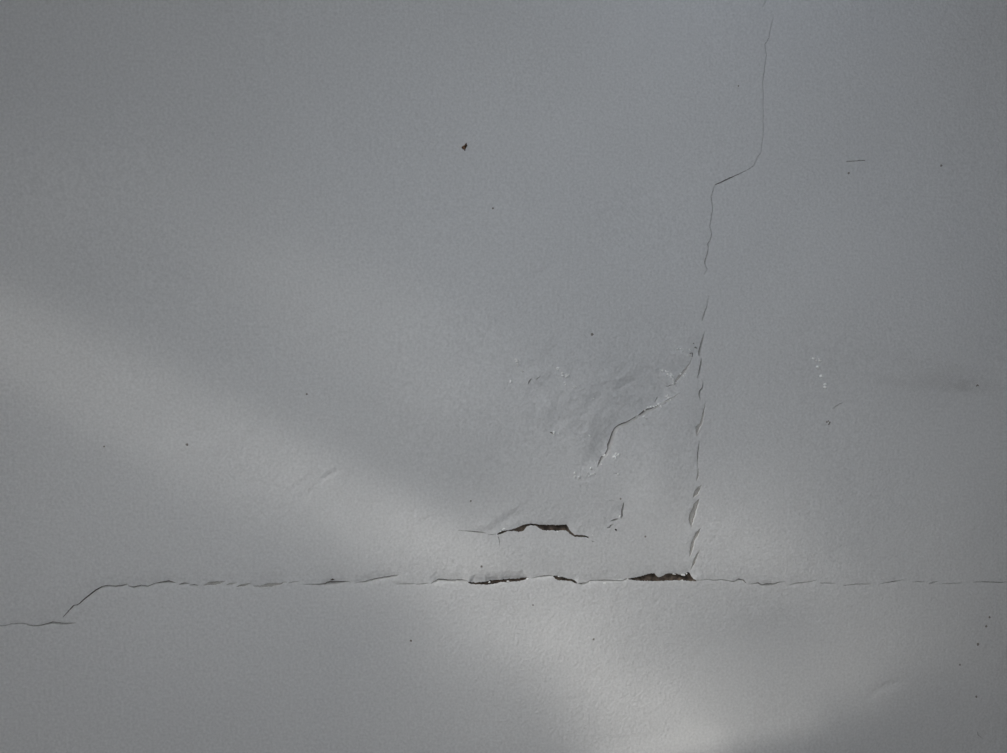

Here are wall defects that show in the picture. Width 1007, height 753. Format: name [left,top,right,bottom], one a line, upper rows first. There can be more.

crack [0,1,952,626]